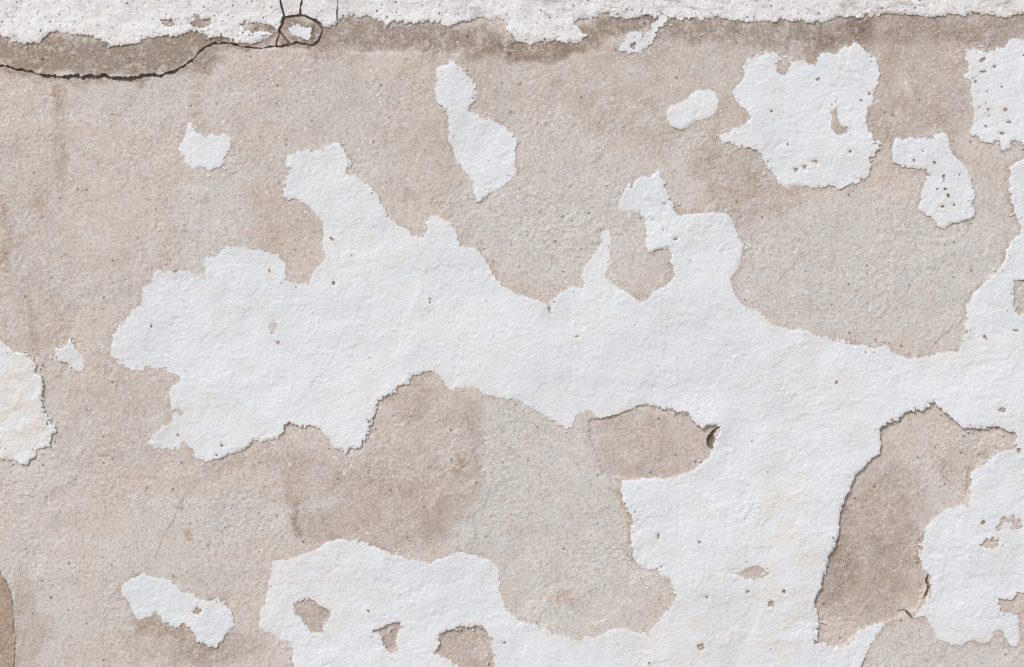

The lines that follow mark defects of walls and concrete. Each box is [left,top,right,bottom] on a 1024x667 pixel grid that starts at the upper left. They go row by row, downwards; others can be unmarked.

peeling [0,31,105,77]
peeling [97,30,219,77]
crack [0,0,339,82]
peeling [618,12,668,54]
peeling [178,122,231,171]
peeling [434,61,517,202]
peeling [666,89,719,130]
peeling [719,40,881,189]
peeling [892,132,976,229]
peeling [589,403,720,480]
peeling [812,401,1024,667]
peeling [121,573,236,648]